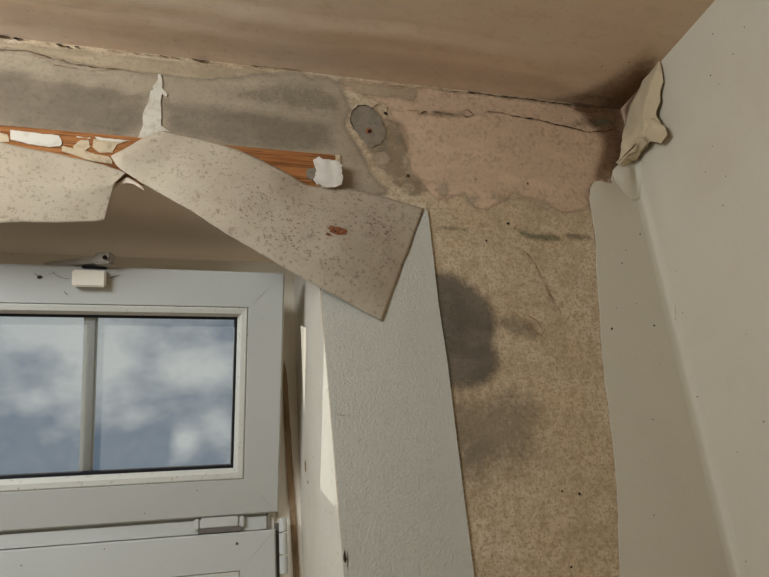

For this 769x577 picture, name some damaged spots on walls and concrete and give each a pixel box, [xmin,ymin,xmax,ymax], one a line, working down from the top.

damp [0,42,262,79]
damp [574,62,648,177]
rust [326,226,347,236]
damp [435,274,497,386]